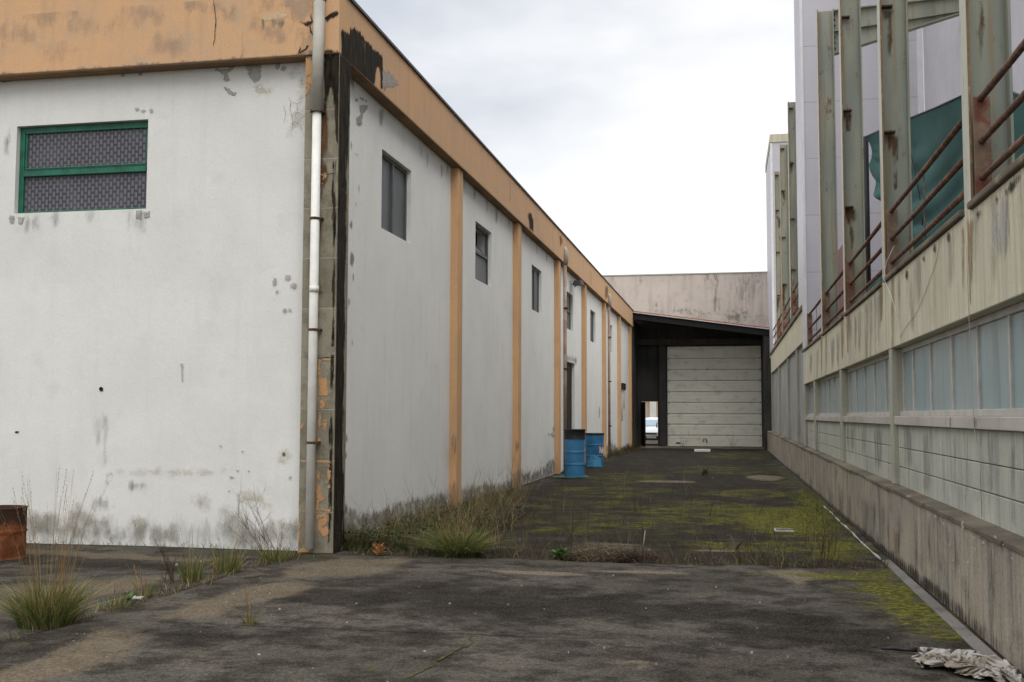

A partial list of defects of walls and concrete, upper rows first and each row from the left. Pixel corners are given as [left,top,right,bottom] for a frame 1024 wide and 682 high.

peeling [215,65,261,96]
peeling [355,97,368,125]
corrosion [888,136,898,158]
peeling [317,358,331,441]
damp [28,511,106,535]
damp [789,468,986,636]